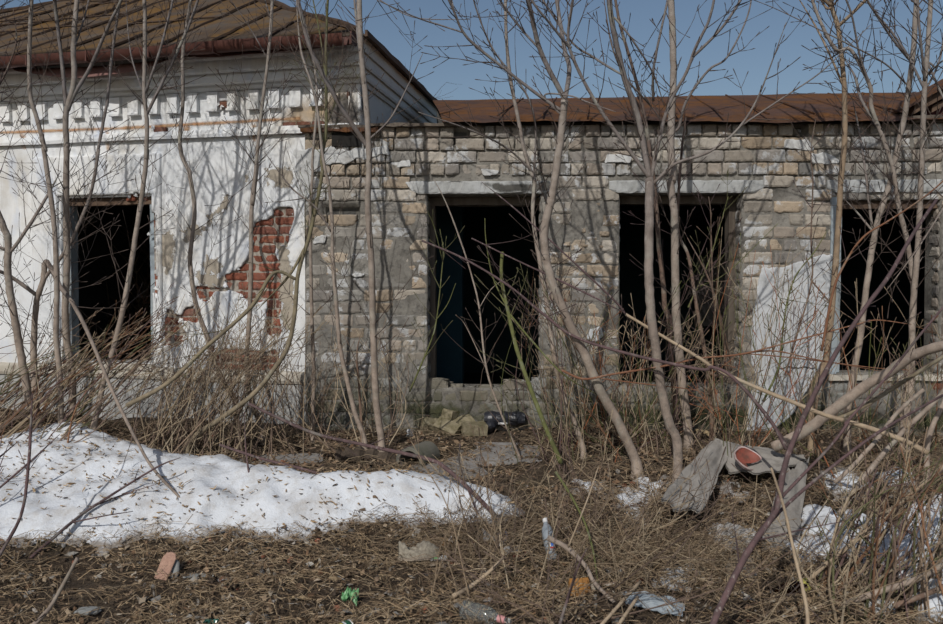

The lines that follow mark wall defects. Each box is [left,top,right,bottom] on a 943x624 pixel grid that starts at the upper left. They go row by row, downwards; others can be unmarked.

peeling [264,166,293,188]
peeling [147,194,229,293]
flaking render [163,207,294,348]